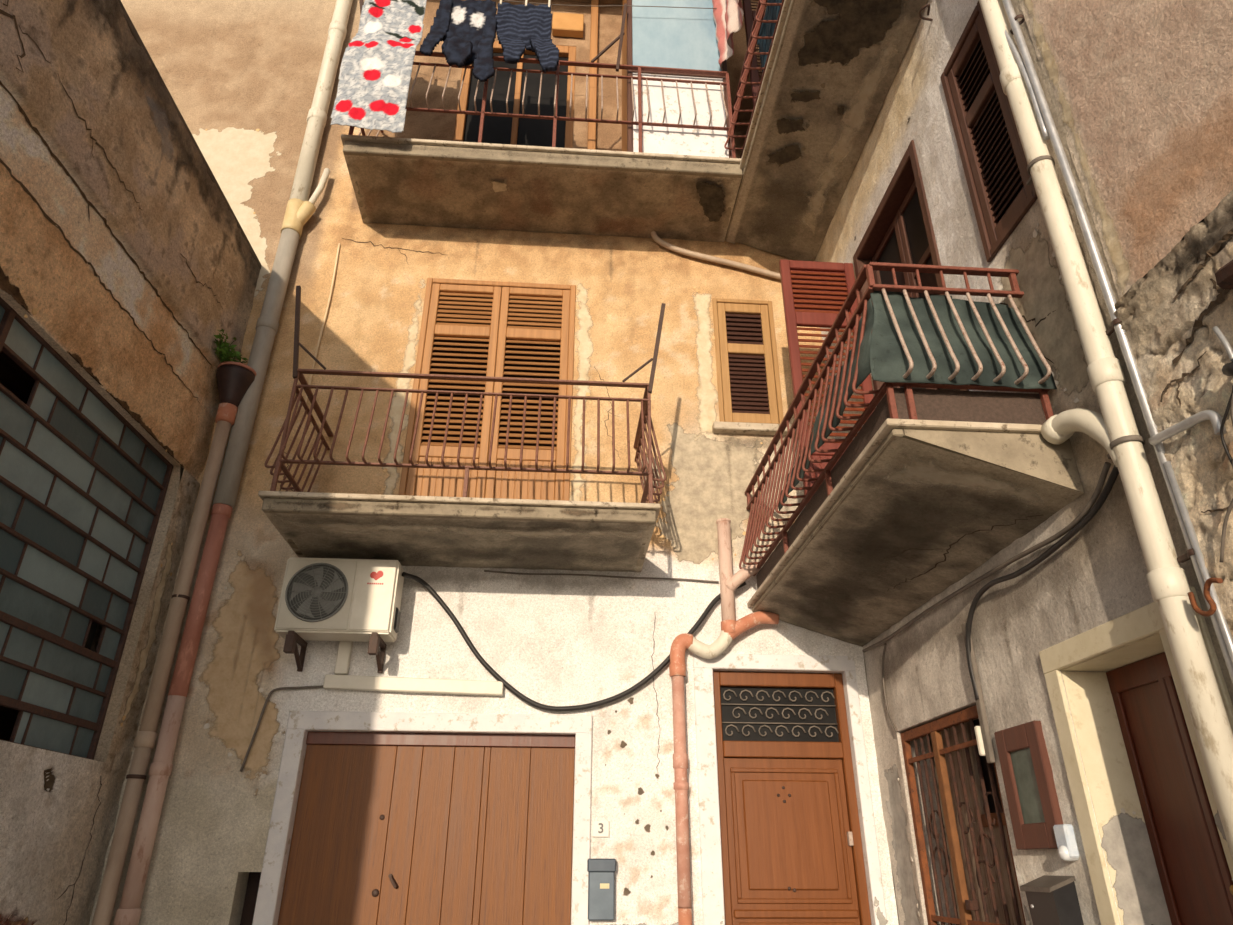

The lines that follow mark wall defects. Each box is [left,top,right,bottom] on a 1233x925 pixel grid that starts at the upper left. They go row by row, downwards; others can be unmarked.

crack [0,0,212,402]
crack [180,253,223,309]
flaking render [192,127,282,297]
crack [1160,228,1233,406]
water stain [888,462,1037,501]
flaking render [199,550,284,794]